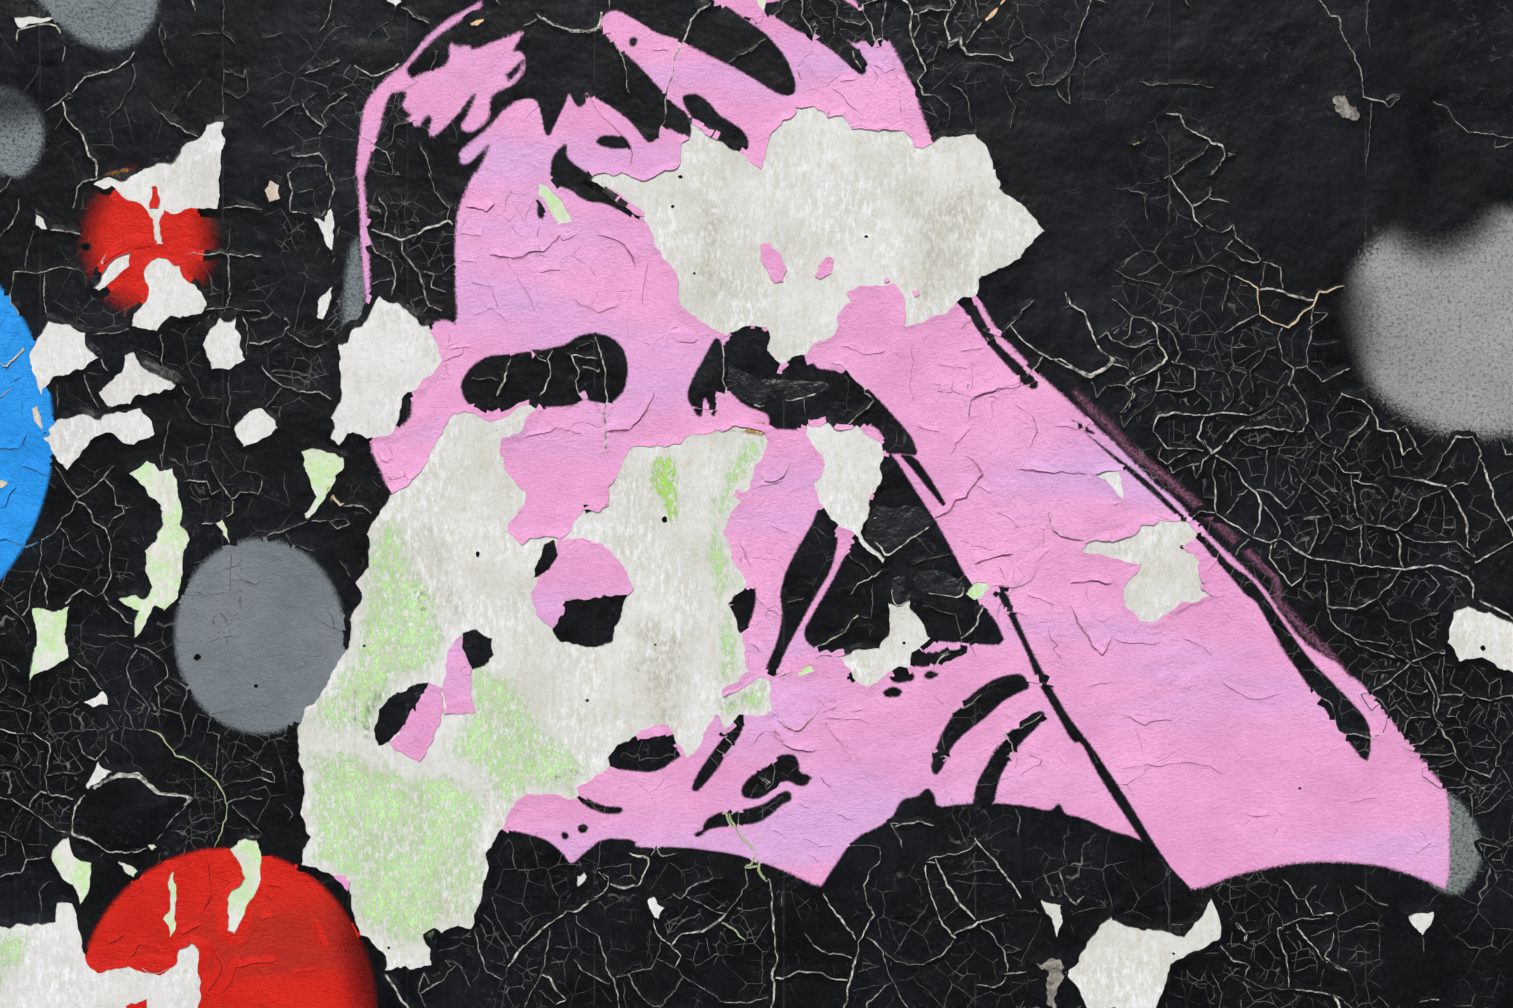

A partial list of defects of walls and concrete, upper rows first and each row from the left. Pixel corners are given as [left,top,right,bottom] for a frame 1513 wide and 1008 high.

peeling [380,0,411,23]
crack [490,0,1194,167]
crack [1311,0,1513,165]
crack [0,0,738,600]
crack [0,434,295,913]
peeling [0,94,1054,1008]
crack [381,76,1513,1008]
peeling [1074,463,1229,632]
peeling [1440,546,1513,681]
crack [219,880,329,995]
peeling [1028,889,1231,1008]